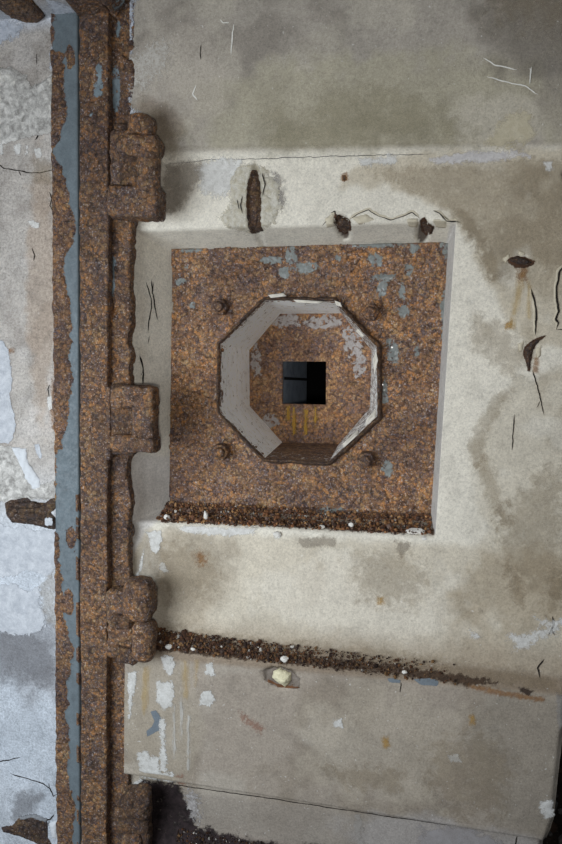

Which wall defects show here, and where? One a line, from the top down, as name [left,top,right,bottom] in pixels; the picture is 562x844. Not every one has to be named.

leakage [128,0,174,114]
spalling [220,162,285,235]
crack [323,208,460,225]
crack [529,265,562,335]
crack [532,370,544,413]
spalling [263,656,300,689]